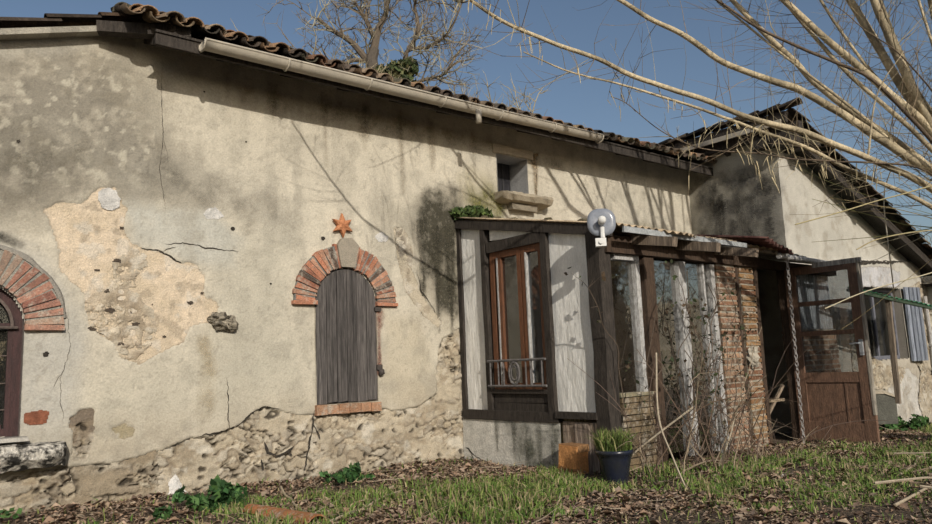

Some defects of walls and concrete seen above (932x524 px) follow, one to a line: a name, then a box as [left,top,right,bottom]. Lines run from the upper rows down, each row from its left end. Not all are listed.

flaking render [43,187,219,365]
crack [142,242,234,263]
damp [419,220,454,324]
flaking render [888,368,925,423]
spalling [69,408,95,462]
flaking render [112,423,135,439]